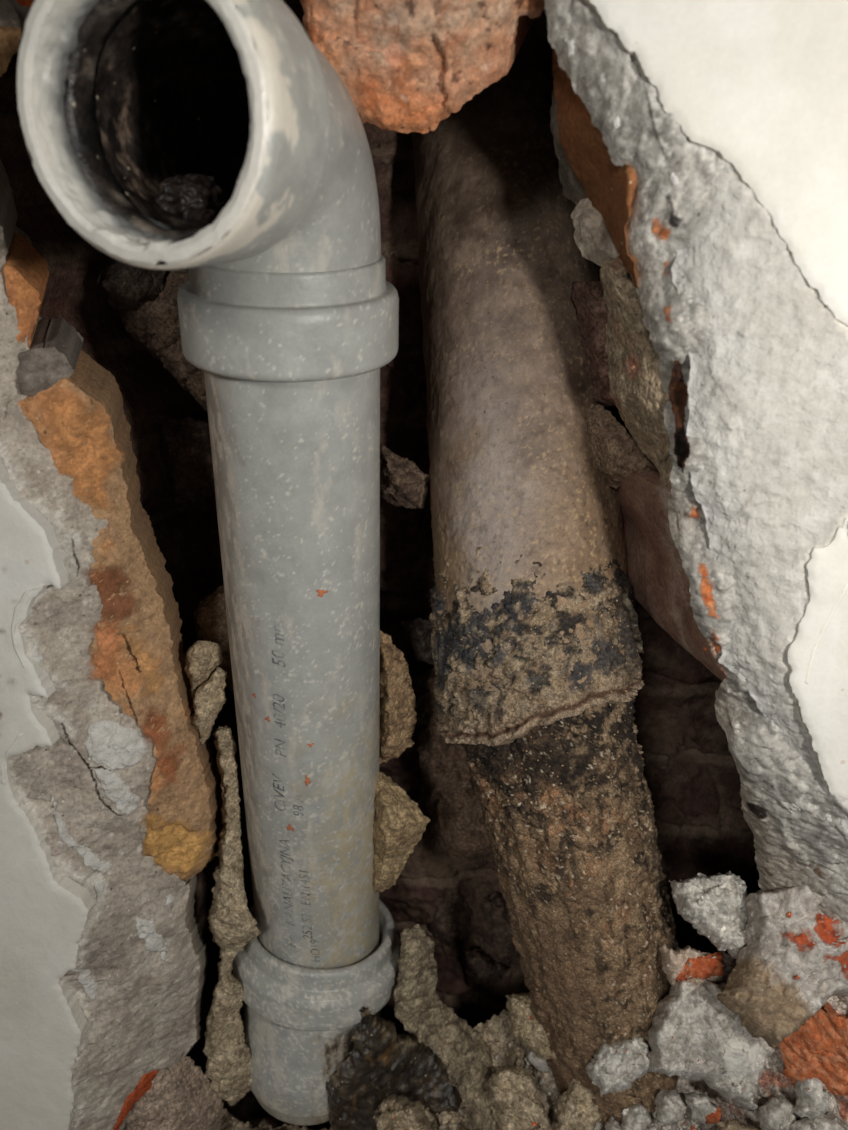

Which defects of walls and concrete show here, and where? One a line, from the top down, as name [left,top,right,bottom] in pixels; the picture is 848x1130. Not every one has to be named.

spalling [0,0,254,1130]
spalling [222,1090,331,1130]
spalling [379,710,529,1034]
spalling [282,0,848,956]